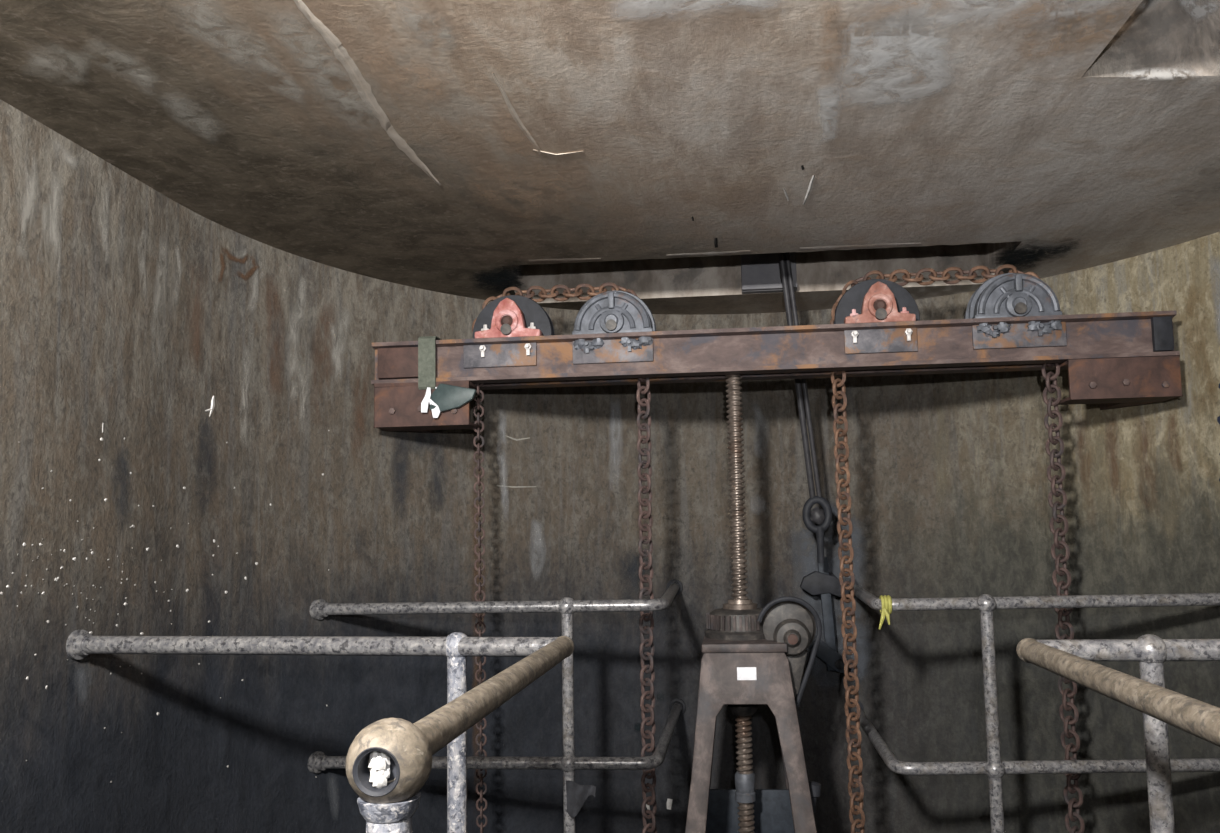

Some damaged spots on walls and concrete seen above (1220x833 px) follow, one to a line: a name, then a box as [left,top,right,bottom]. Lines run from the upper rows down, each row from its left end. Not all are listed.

damp [19,164,60,267]
damp [139,232,181,348]
damp [241,350,249,440]
damp [289,279,307,417]
damp [332,312,348,376]